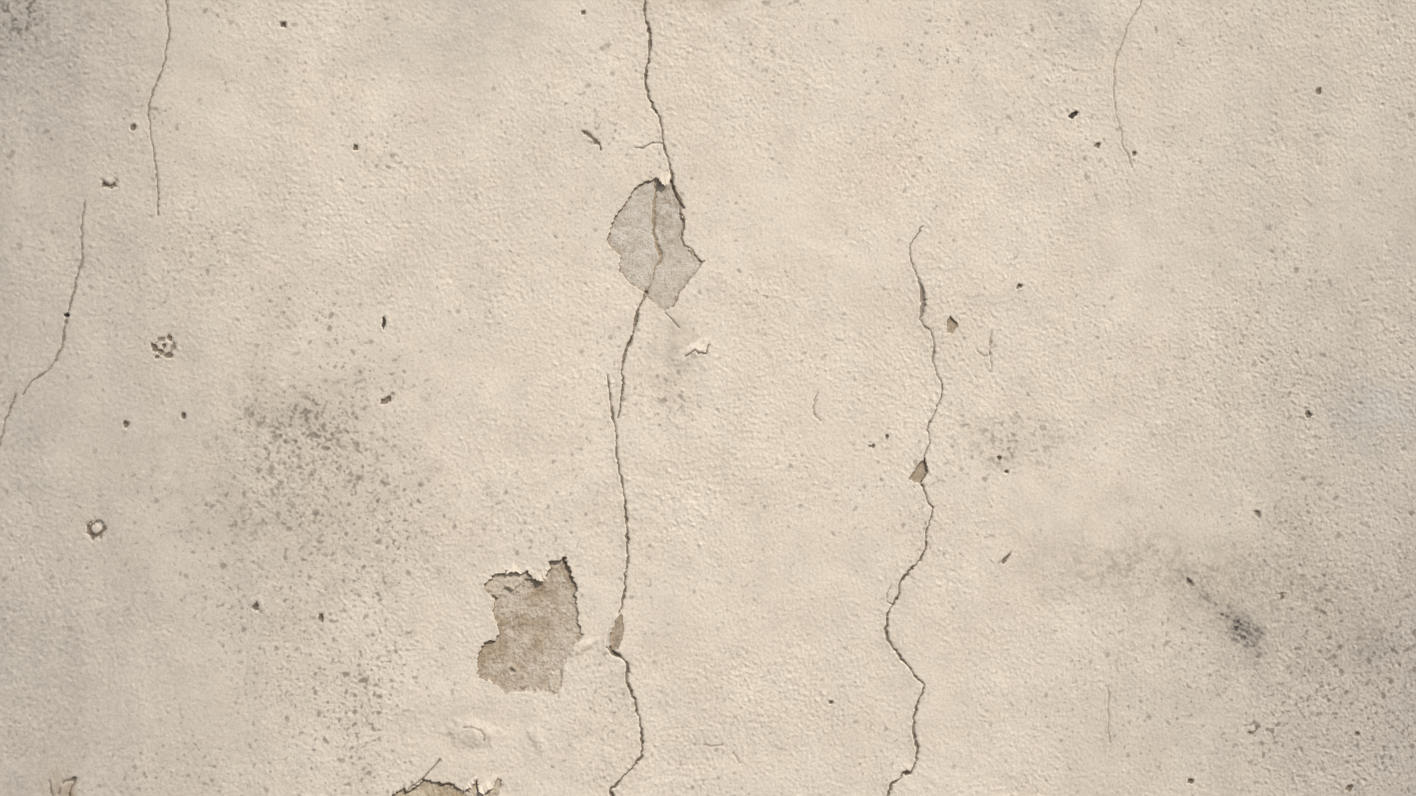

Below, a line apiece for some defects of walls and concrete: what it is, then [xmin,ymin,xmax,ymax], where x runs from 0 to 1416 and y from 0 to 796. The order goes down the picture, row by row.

crack [147,0,171,216]
crack [1113,0,1144,168]
crack [0,202,86,446]
crack [581,0,710,796]
peeling [607,171,705,311]
crack [883,226,943,796]
peeling [477,557,585,695]
crack [48,777,76,796]
peeling [392,775,504,796]